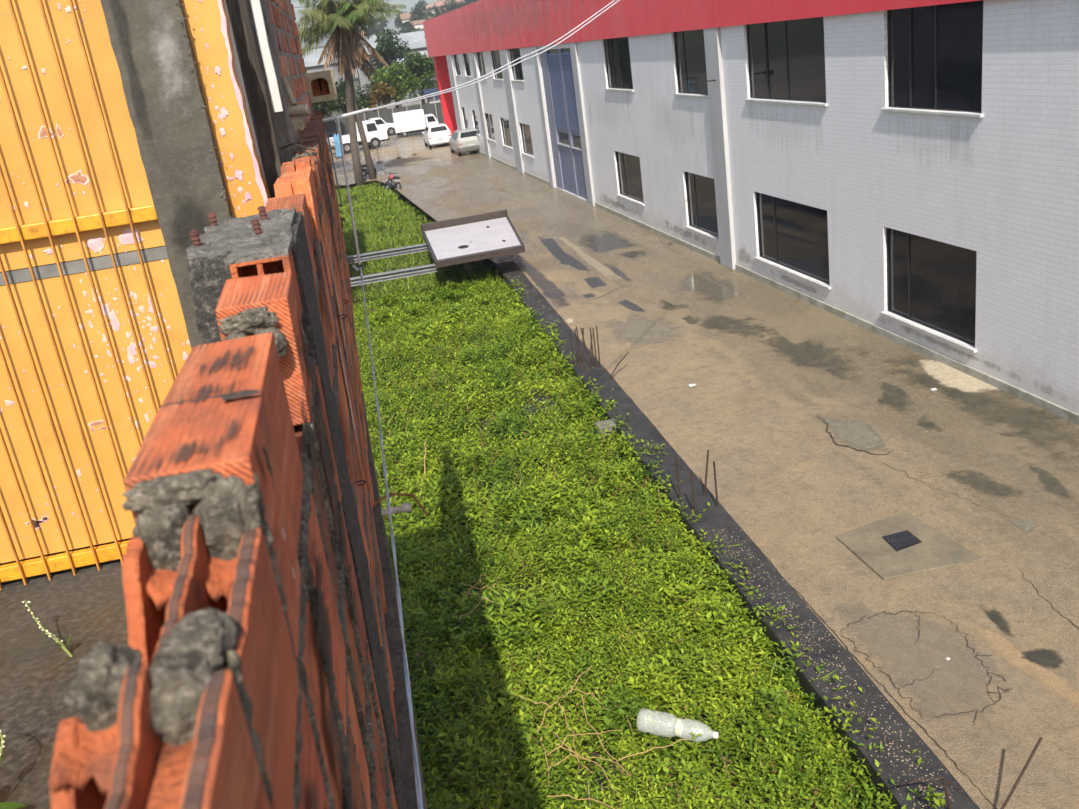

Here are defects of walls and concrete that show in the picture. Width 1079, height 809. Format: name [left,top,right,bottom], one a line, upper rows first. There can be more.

peeling [28,123,70,142]
peeling [49,157,97,195]
peeling [3,227,144,260]
peeling [206,0,268,235]
peeling [62,264,190,429]
crack [756,545,1013,809]